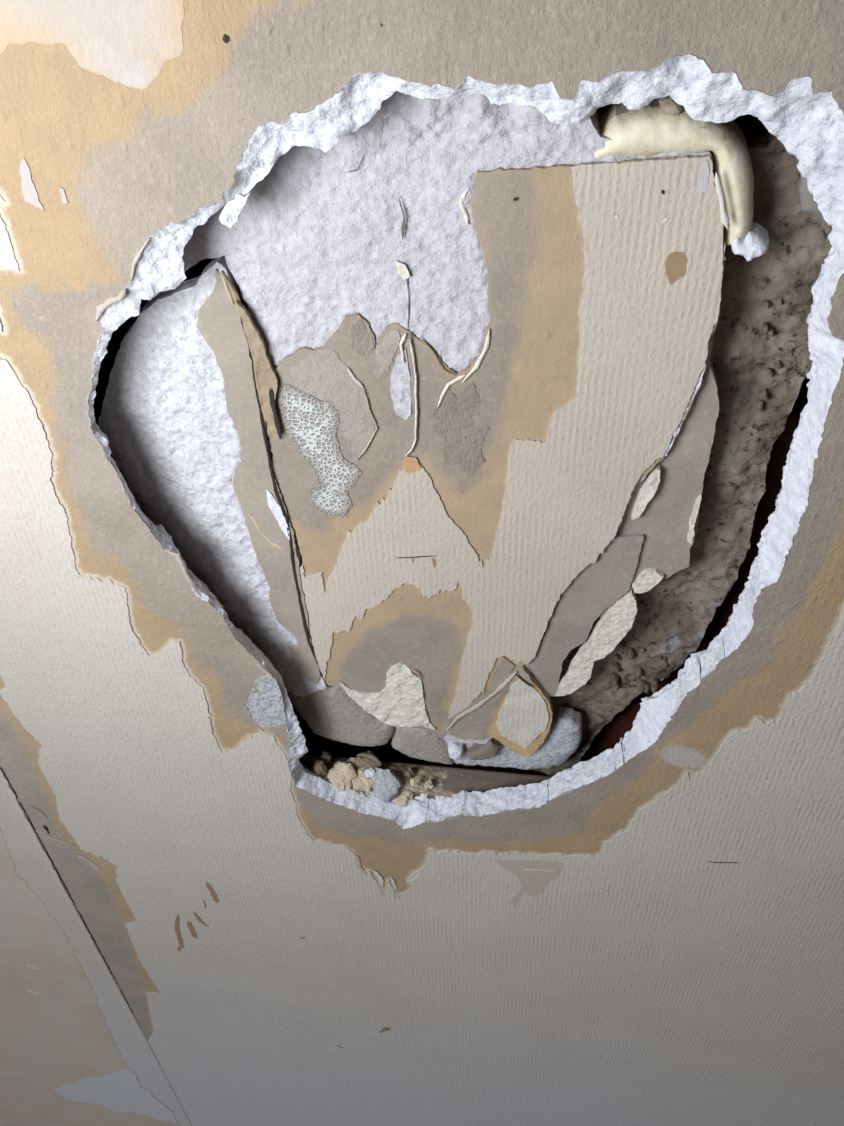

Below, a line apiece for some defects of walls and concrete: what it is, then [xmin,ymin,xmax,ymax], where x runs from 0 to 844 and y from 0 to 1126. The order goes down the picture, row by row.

leakage [715,172,730,230]
peeling [0,0,844,899]
peeling [0,675,160,1040]
crack [0,768,192,1126]
spalling [174,882,220,952]
peeling [493,859,564,907]